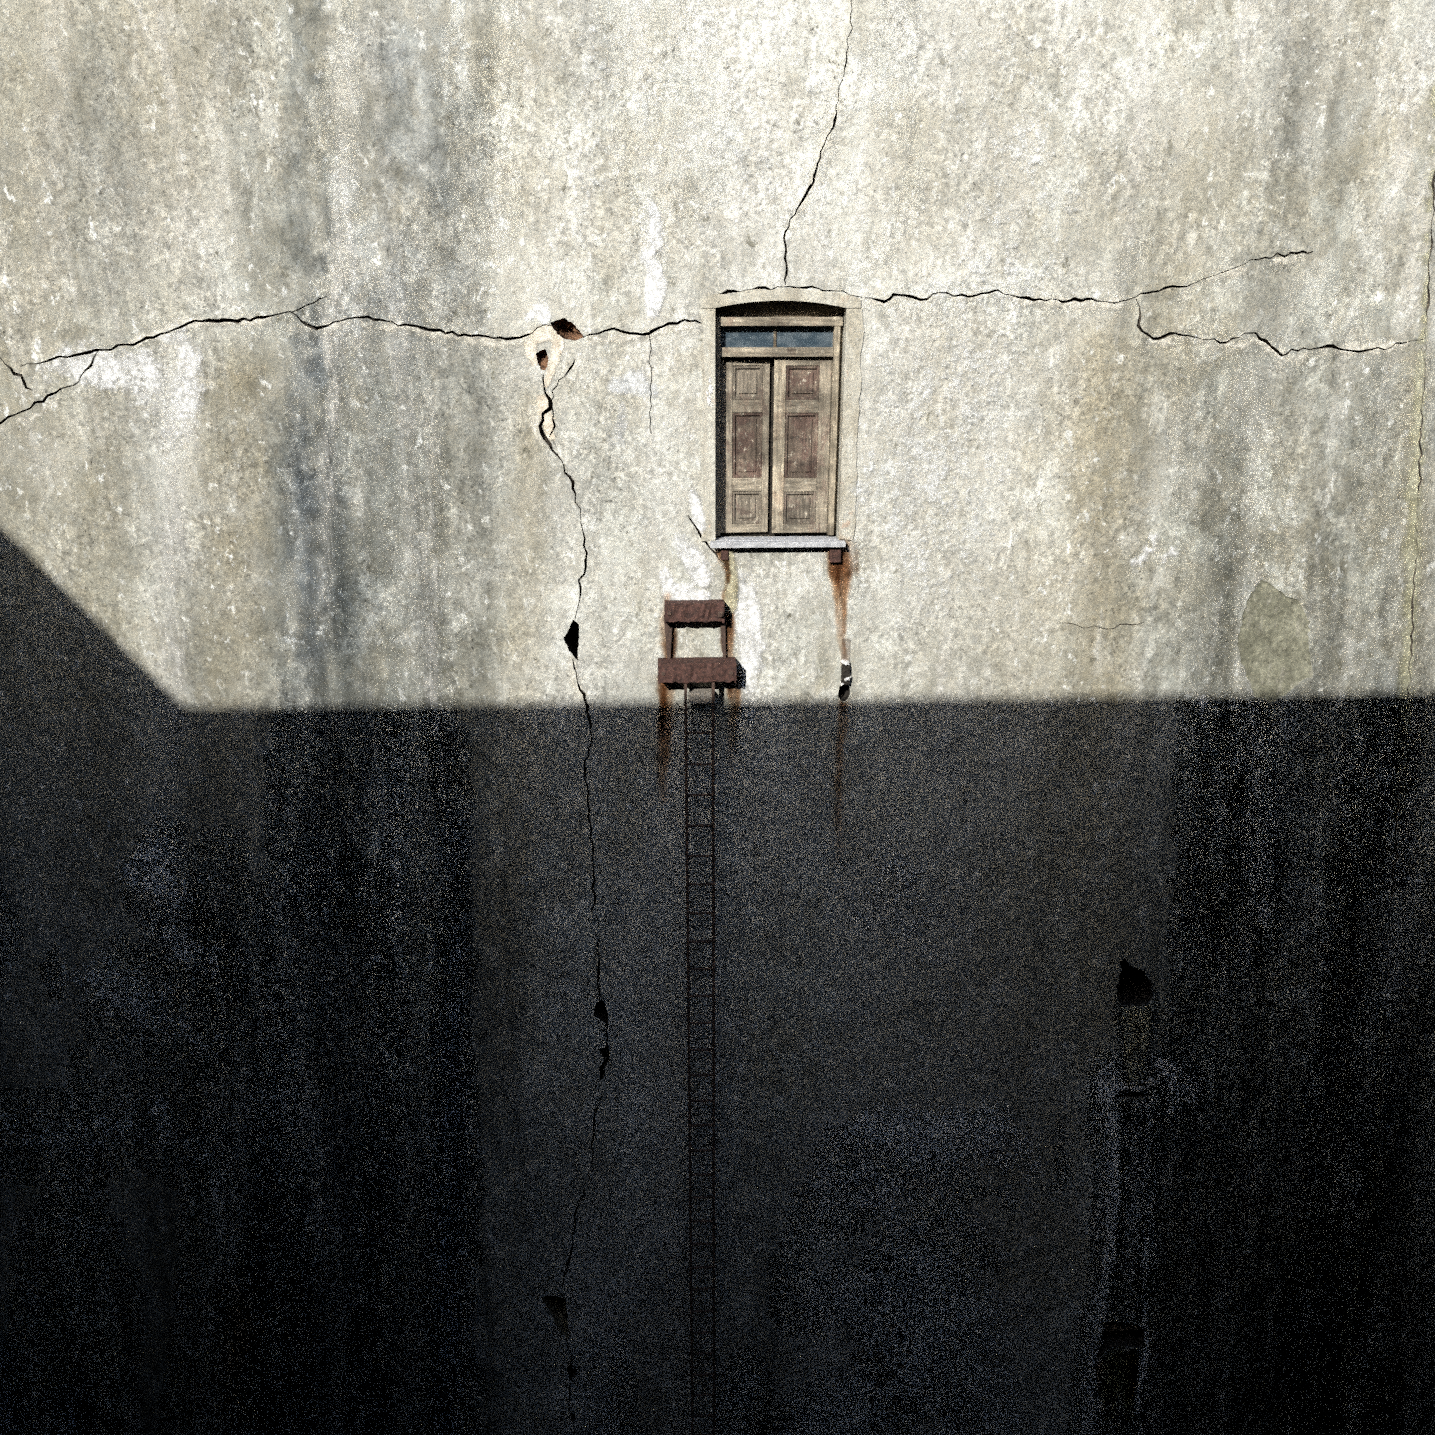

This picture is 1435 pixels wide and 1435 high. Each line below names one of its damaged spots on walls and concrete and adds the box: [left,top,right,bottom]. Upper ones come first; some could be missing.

crack [0,296,552,432]
spalling [524,302,584,440]
crack [528,319,702,619]
spalling [563,620,579,660]
rust [666,622,676,659]
rust [717,549,738,650]
rust [832,547,844,584]
leakage [1131,535,1176,564]
crack [719,0,1435,1435]
leakage [122,839,189,908]
spalling [1116,959,1153,1006]
leakage [1078,1062,1121,1435]